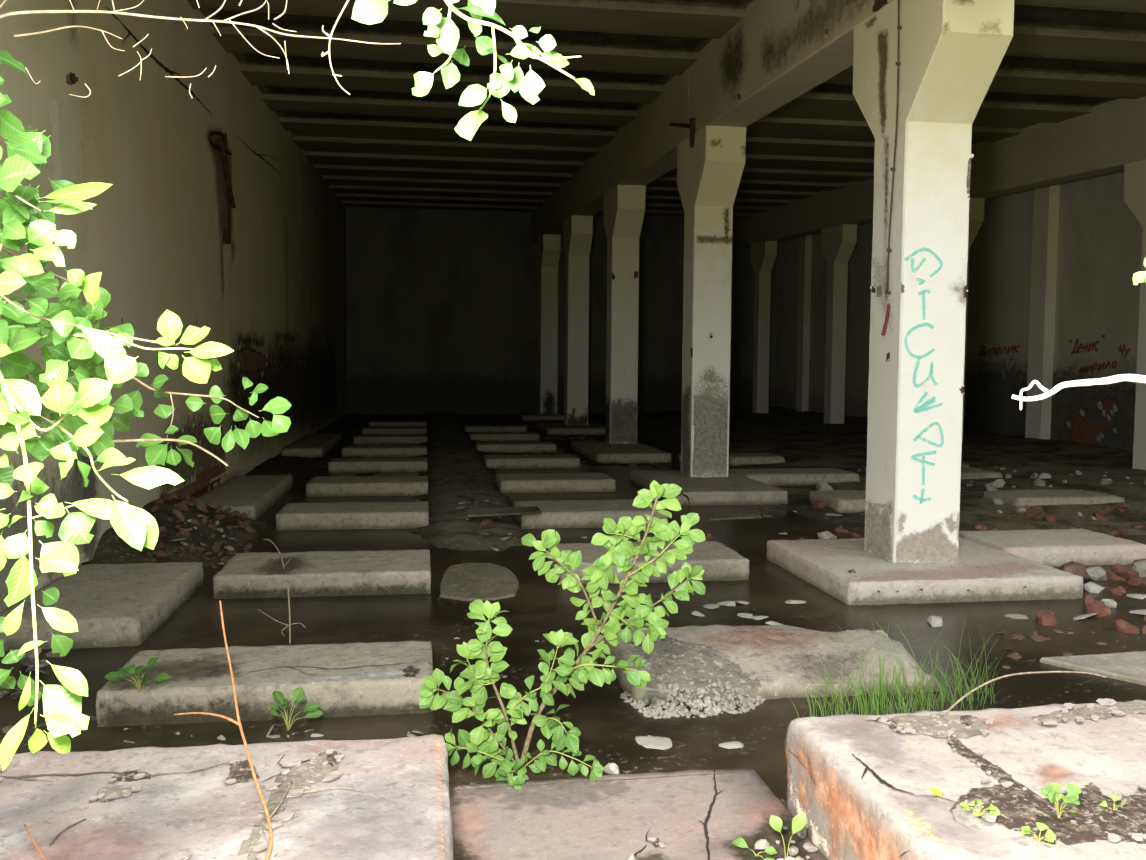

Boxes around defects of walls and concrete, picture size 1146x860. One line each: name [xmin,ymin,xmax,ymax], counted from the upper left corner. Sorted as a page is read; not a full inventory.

crack [106,7,213,116]
damp [769,0,864,65]
corrosion [212,135,234,292]
damp [605,400,637,444]
damp [681,370,728,477]
spalling [1032,698,1146,726]
spalling [89,767,155,802]
spalling [224,749,345,860]
crack [457,770,747,860]
crack [787,749,818,787]
crack [850,754,970,829]
spalling [886,710,1146,845]